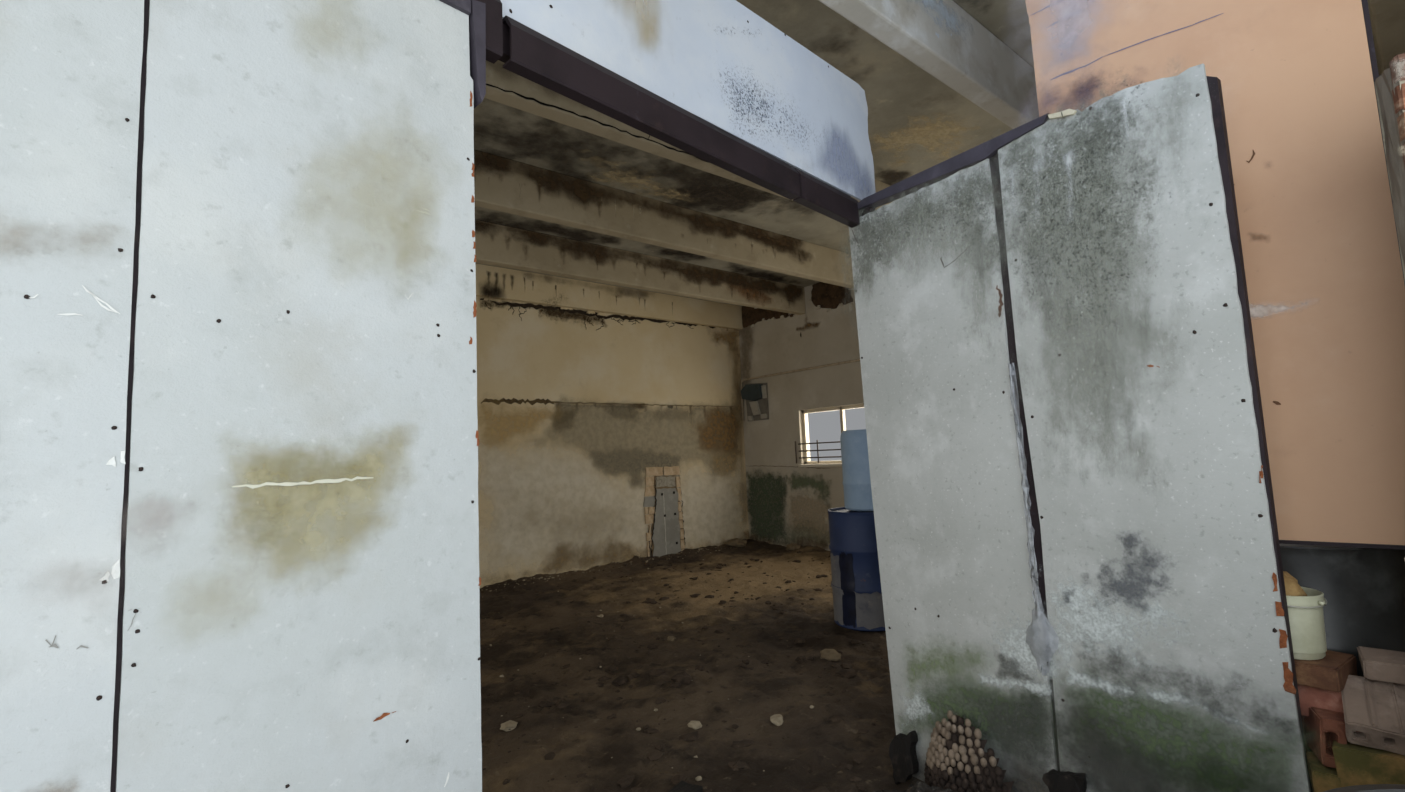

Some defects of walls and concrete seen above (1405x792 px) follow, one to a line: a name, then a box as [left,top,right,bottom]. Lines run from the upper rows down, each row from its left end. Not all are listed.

leakage [725,79,807,140]
leakage [474,120,807,260]
leakage [475,214,803,302]
leakage [846,105,1151,416]
leakage [232,451,385,553]
leakage [979,534,1290,731]
leakage [901,694,931,719]